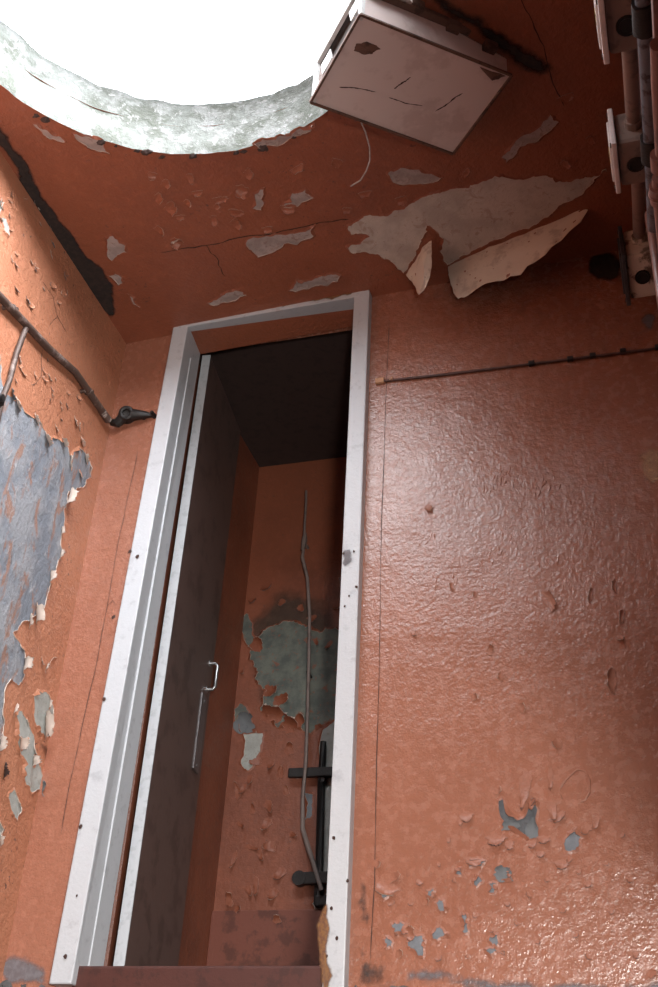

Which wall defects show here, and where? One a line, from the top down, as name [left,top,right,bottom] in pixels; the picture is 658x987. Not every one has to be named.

peeling [345,113,606,299]
peeling [104,234,142,308]
peeling [205,289,248,307]
peeling [288,272,342,293]
peeling [0,354,93,848]
peeling [233,583,339,871]
peeling [485,767,565,858]
peeling [562,815,601,854]
peeling [375,870,401,906]
peeling [382,879,479,961]
peeling [452,856,514,895]
peeling [642,969,657,980]